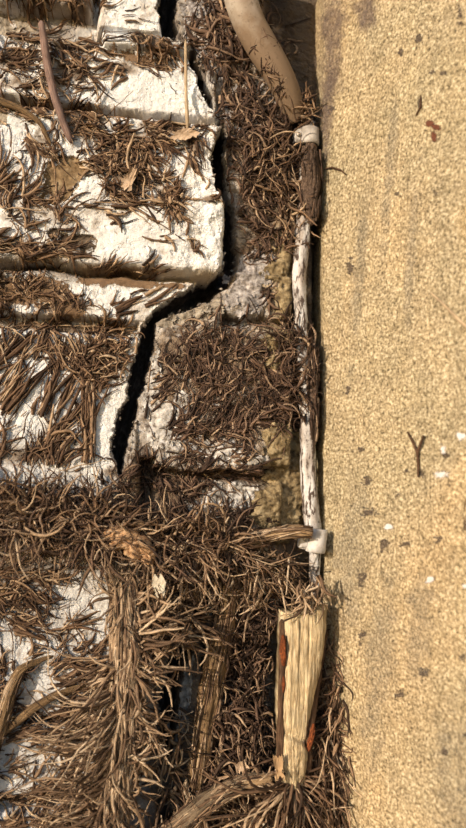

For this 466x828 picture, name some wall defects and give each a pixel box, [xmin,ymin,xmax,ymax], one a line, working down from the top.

crack [154,0,180,41]
crack [108,57,238,470]
crack [158,586,210,770]